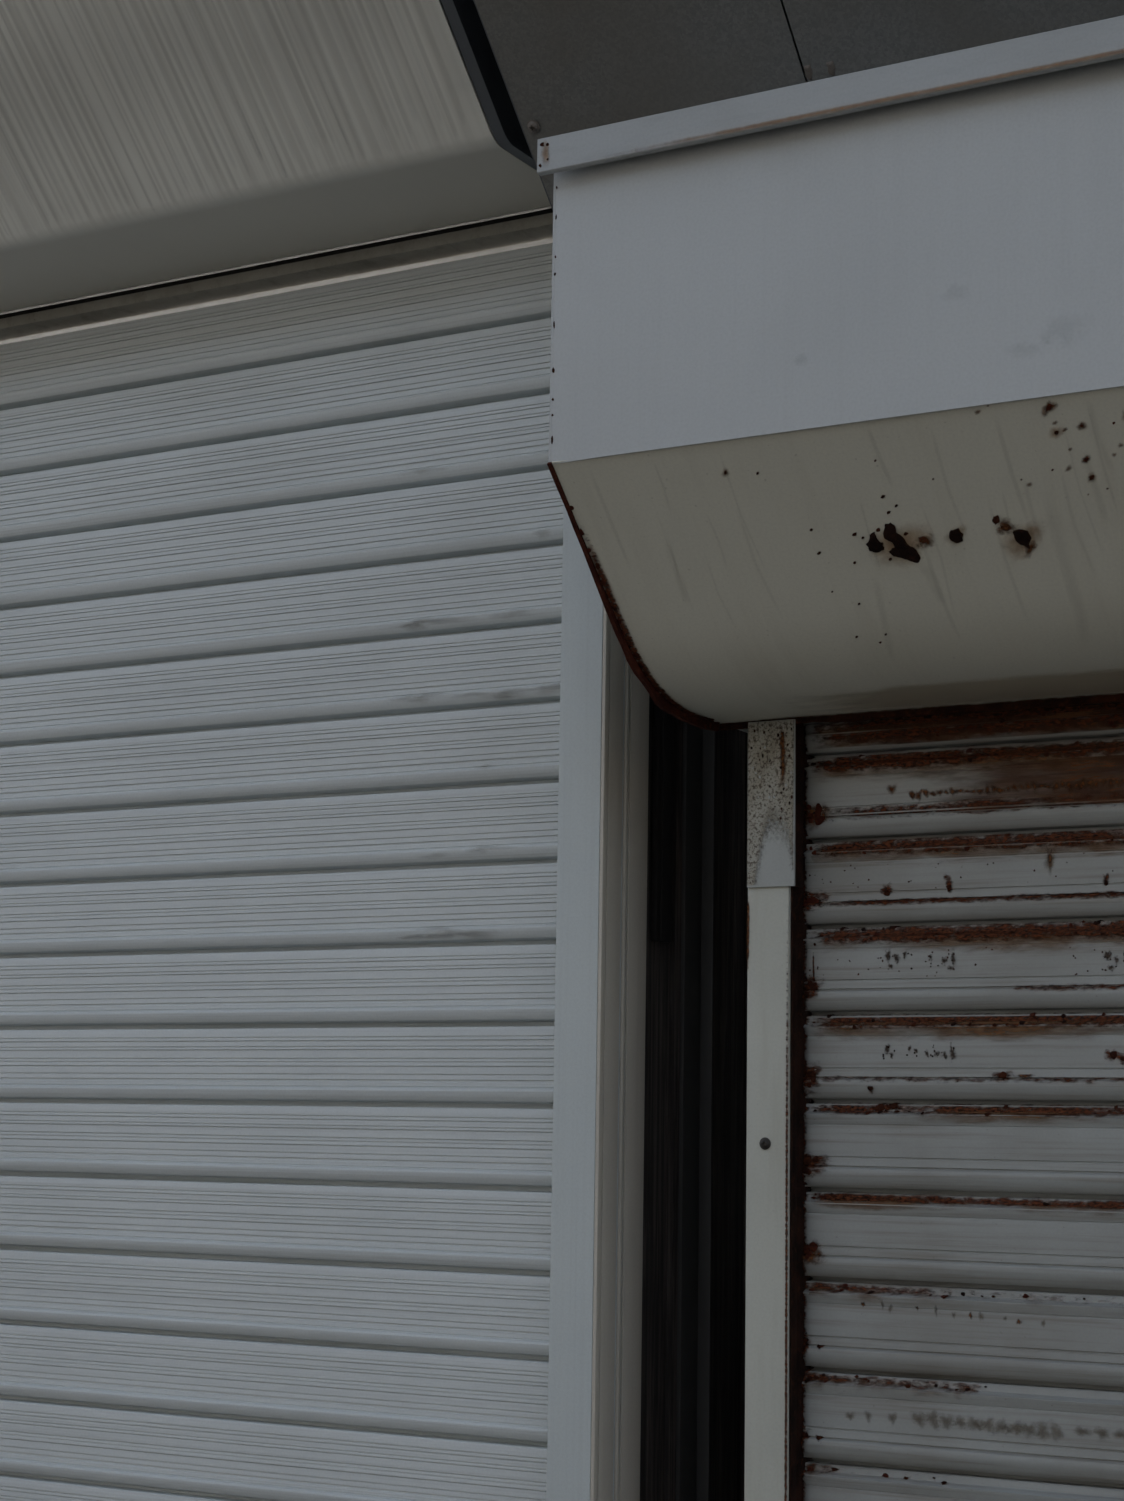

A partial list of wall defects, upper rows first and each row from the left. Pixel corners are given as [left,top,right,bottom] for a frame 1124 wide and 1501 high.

rust [1042,402,1086,435]
rust [852,495,931,564]
rust [992,515,1036,555]
rust [579,528,720,724]
rust [768,693,1124,1501]